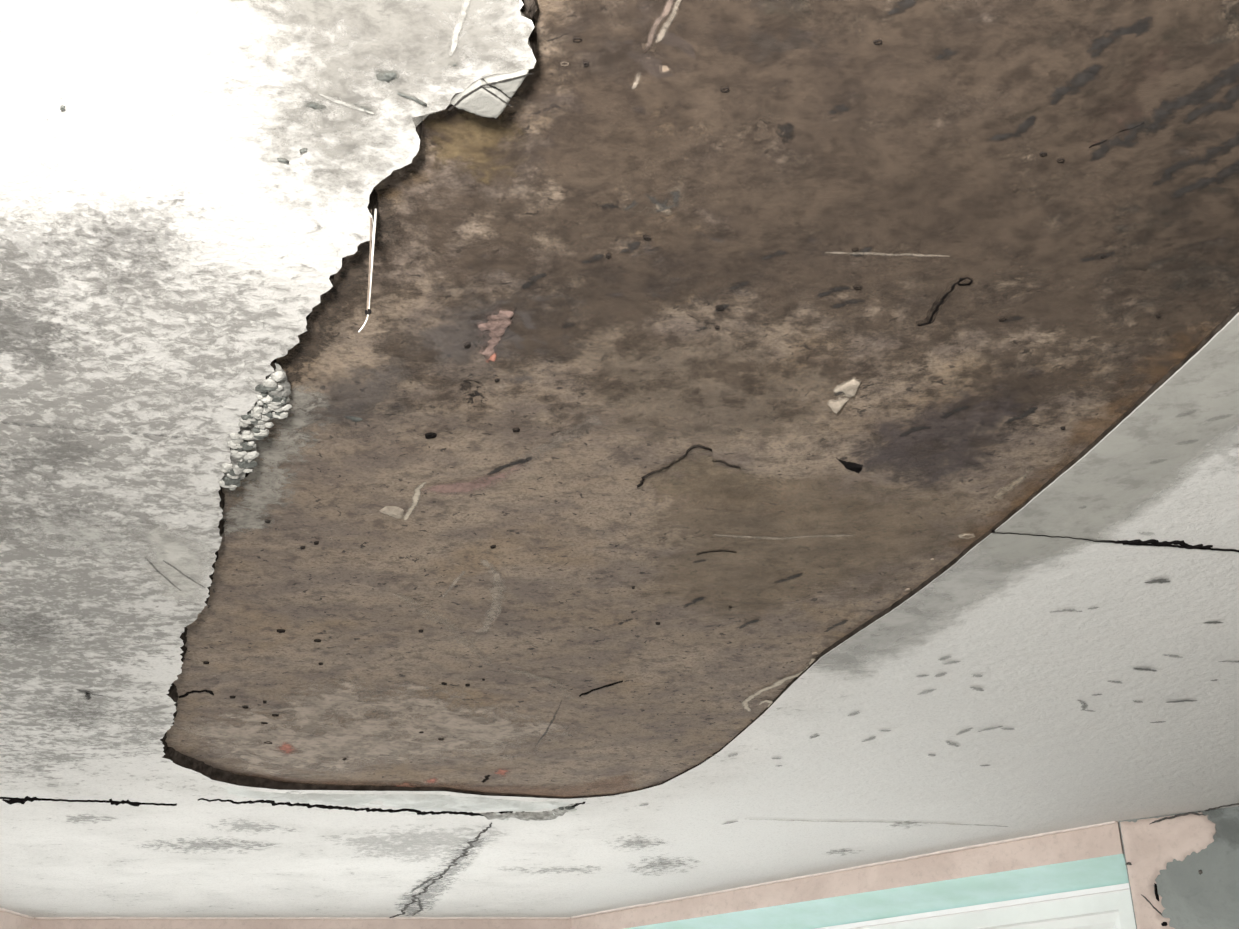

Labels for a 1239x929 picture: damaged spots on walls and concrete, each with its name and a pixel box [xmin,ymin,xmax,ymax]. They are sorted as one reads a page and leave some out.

crack [991,530,1239,552]
leakage [190,680,567,776]
leakage [742,659,815,711]
crack [0,796,524,918]